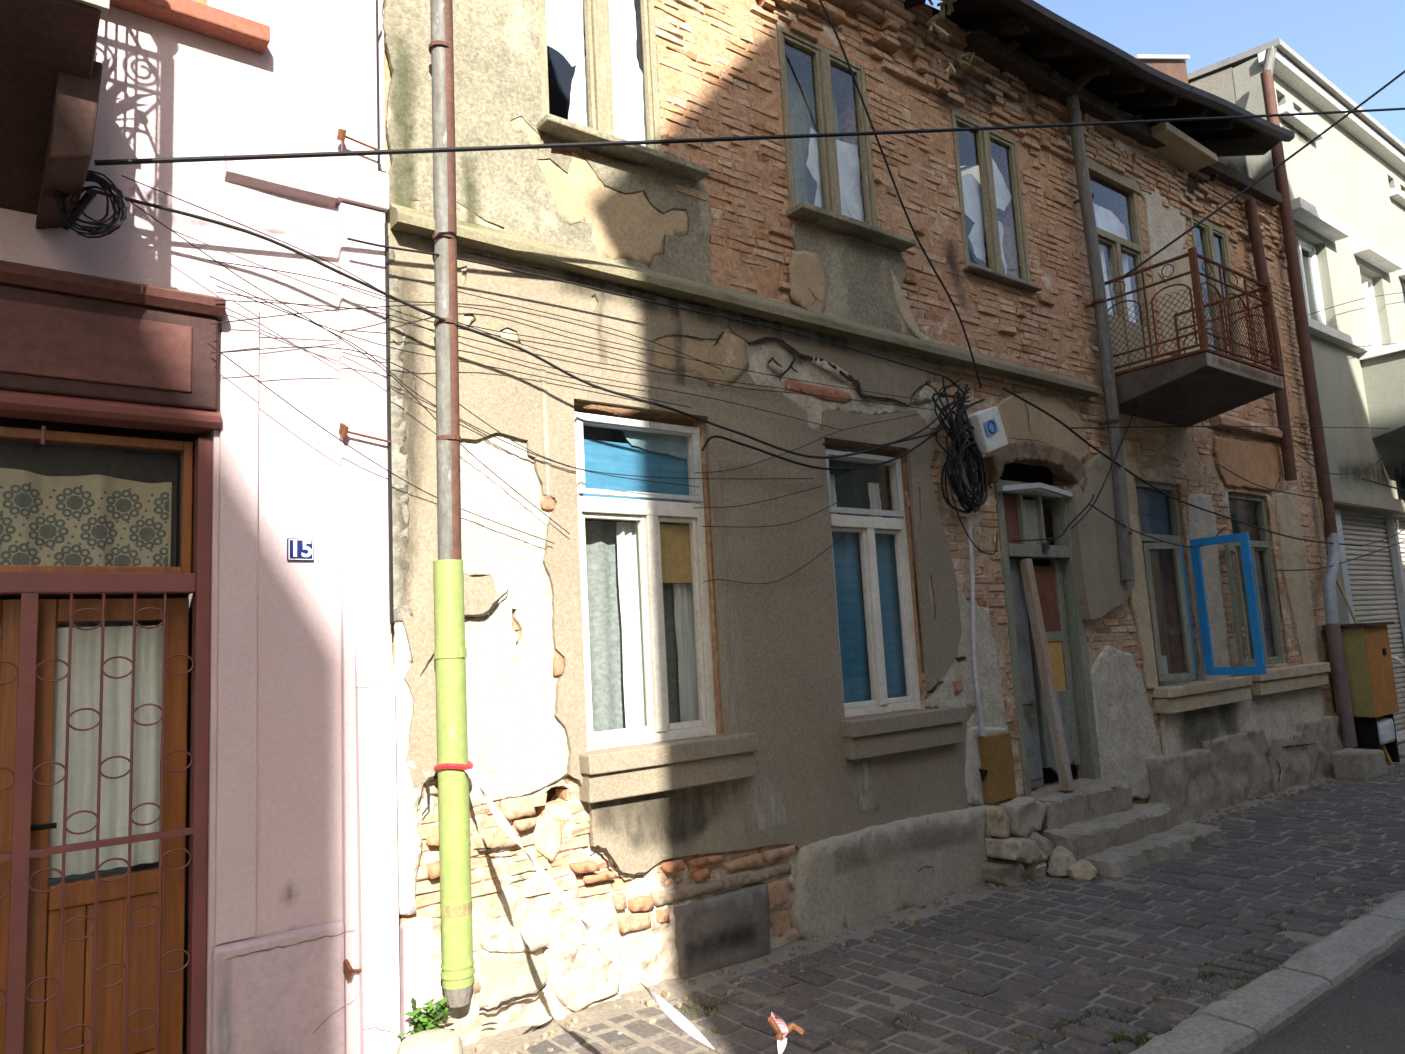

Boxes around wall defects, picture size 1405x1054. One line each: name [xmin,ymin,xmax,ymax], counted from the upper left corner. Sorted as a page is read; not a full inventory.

flaking render [500,328,519,343]
flaking render [510,0,1336,797]
flaking render [399,778,441,960]
flaking render [460,433,797,952]